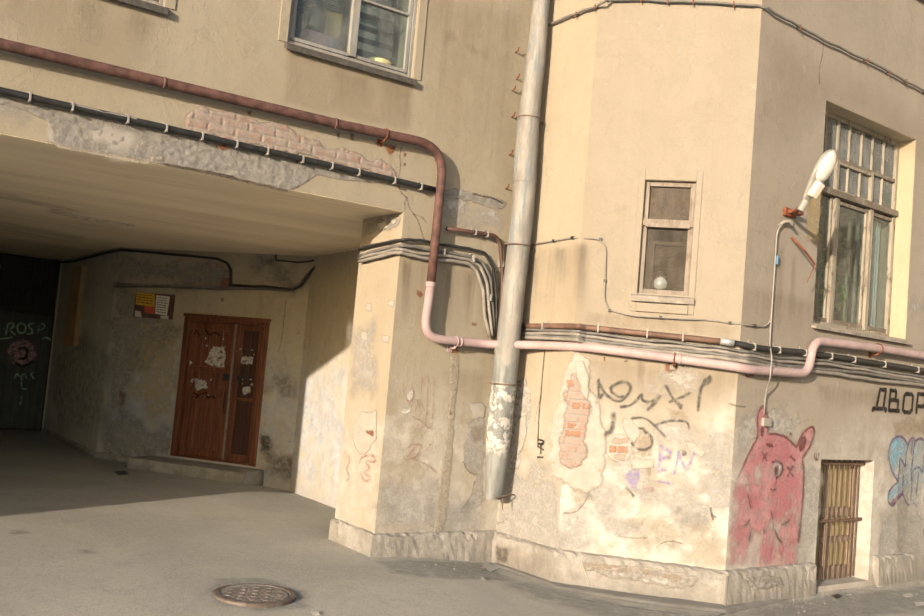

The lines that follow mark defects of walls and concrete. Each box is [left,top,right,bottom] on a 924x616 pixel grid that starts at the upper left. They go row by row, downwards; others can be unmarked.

flaking render [0,96,396,192]
flaking render [497,353,654,548]